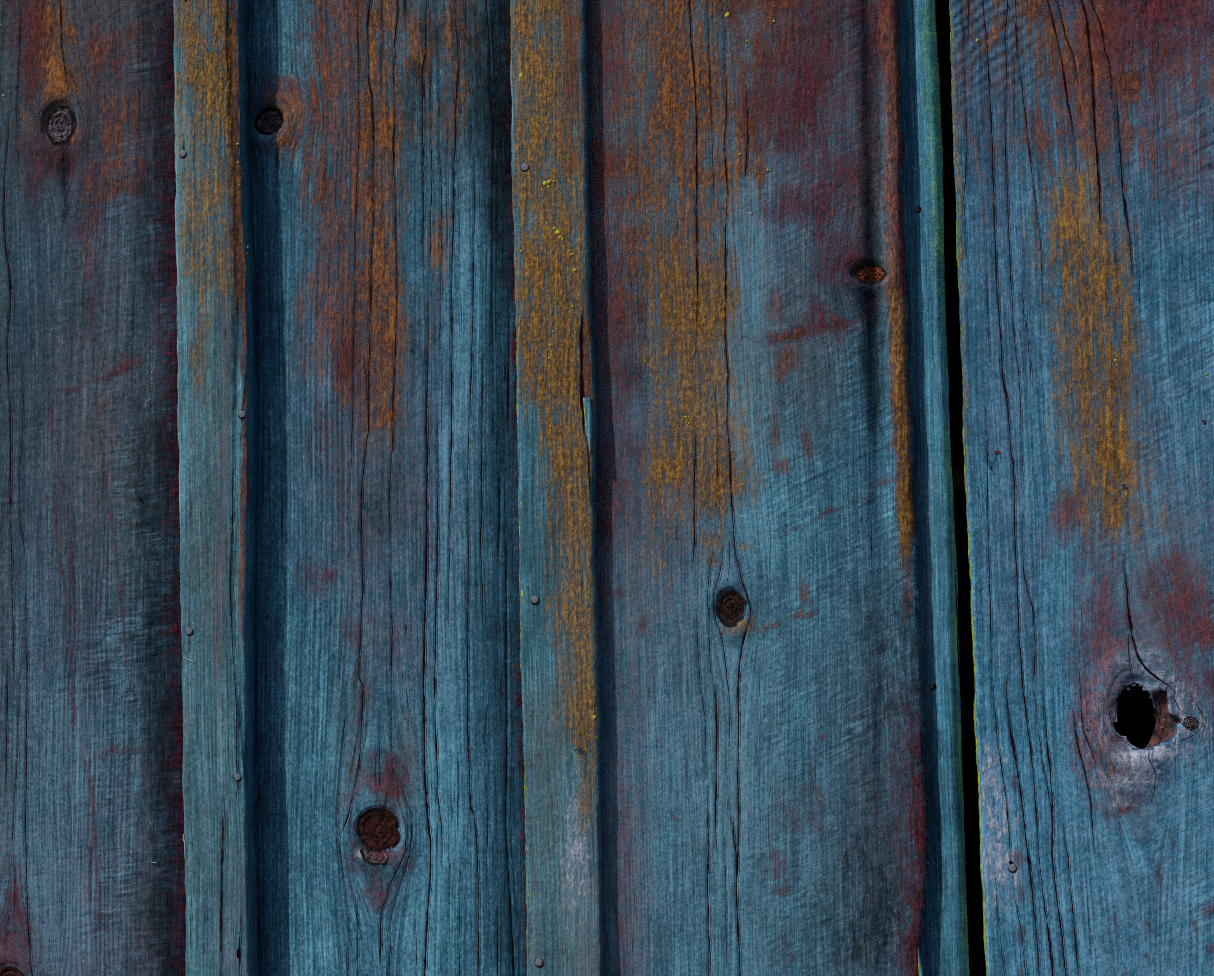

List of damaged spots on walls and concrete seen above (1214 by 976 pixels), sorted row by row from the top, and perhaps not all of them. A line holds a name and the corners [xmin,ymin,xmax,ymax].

crack [1047,0,1132,273]
crack [961,0,1112,976]
crack [1124,554,1206,802]